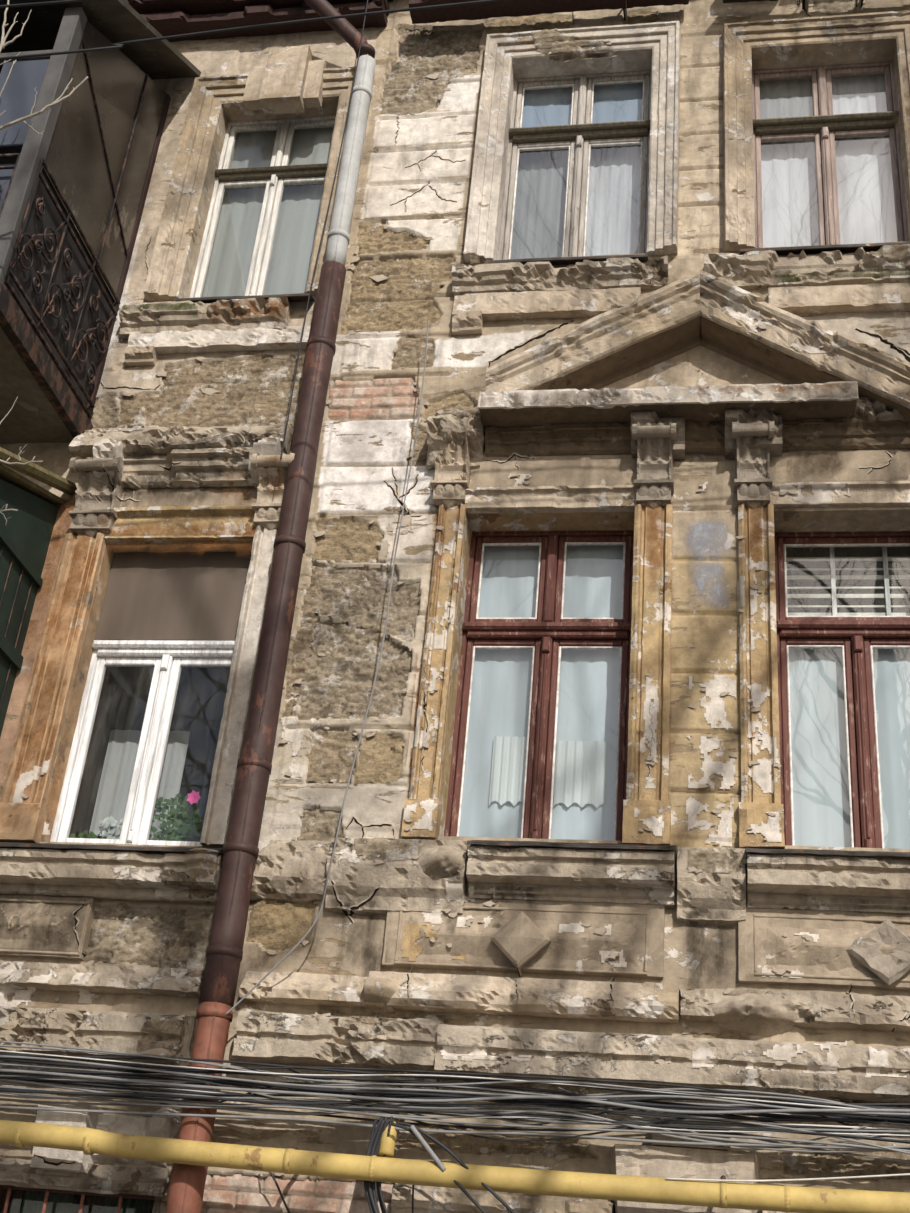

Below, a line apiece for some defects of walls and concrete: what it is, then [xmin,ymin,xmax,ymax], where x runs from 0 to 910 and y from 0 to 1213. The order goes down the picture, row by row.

flaking render [380,14,617,116]
flaking render [326,223,485,462]
crack [855,327,910,362]
flaking render [91,356,305,438]
peeling [435,526,456,559]
peeling [737,538,769,651]
flaking render [278,516,451,865]
peeling [643,674,659,766]
peeling [634,808,664,836]
peeling [686,675,782,874]